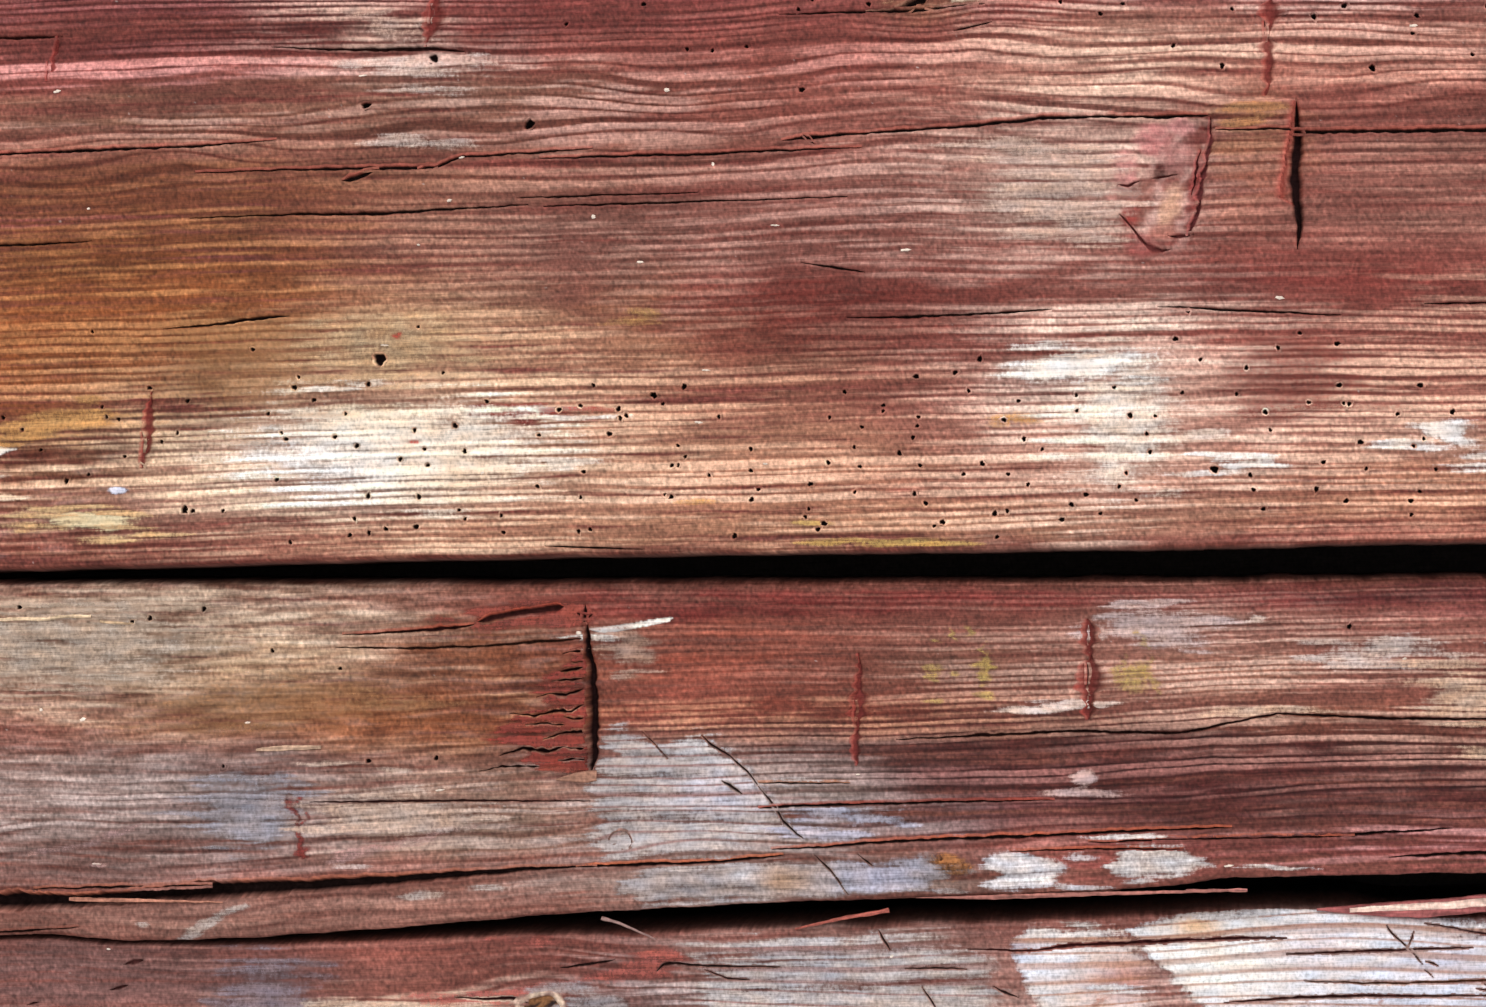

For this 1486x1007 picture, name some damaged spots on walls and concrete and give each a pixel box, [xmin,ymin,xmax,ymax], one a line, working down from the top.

peeling [993,699,1120,714]
crack [896,710,1486,743]
peeling [153,761,510,856]
crack [0,729,1486,935]
peeling [576,723,960,908]
peeling [970,833,1208,890]
crack [454,994,529,1006]
crack [560,957,616,971]
crack [656,960,781,981]
peeling [686,932,1003,1007]
crack [876,922,1486,1007]
peeling [1011,909,1486,1007]